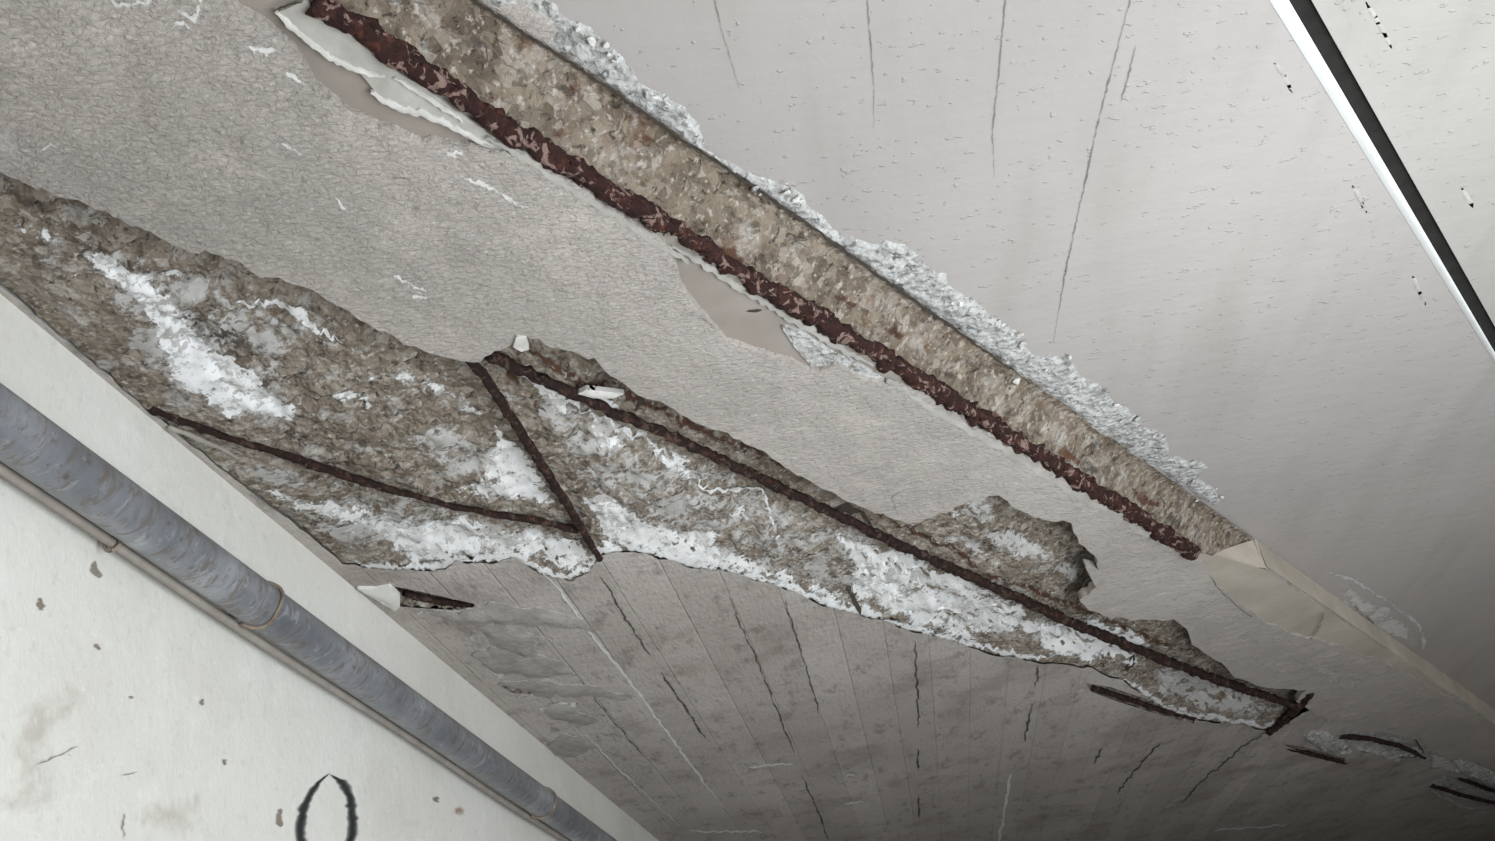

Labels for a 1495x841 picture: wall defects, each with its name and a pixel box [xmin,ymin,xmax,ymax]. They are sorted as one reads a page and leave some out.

damp [10,191,57,241]
damp [83,246,357,428]
spalling [0,172,1298,758]
corrosion [529,349,792,472]
spalling [237,0,1255,556]
crack [1054,2,1135,337]
corrosion [1134,492,1159,507]
crack [599,576,706,739]
crack [728,596,829,841]
crack [847,586,862,615]
corrosion [871,512,1198,657]
spalling [1285,730,1423,762]